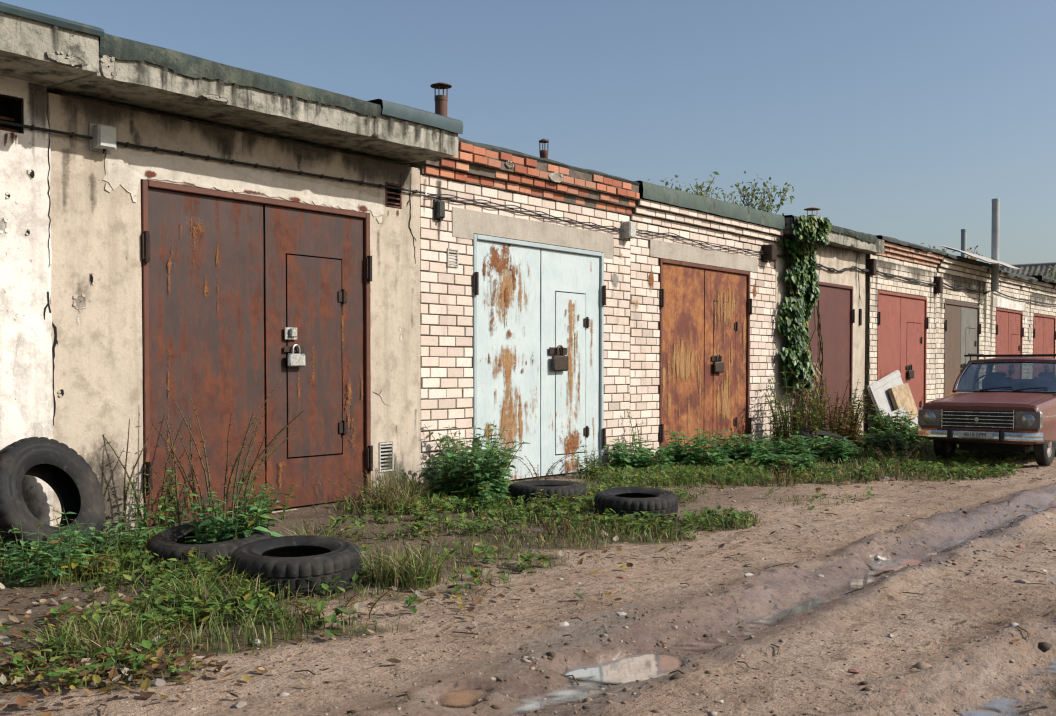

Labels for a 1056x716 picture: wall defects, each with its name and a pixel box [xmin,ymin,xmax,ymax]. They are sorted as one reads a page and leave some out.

damp [29,82,47,124]
damp [62,92,411,187]
rust [346,376,363,451]
rust [483,244,534,471]
rust [559,300,593,475]
rust [662,338,701,434]
rust [715,291,745,428]